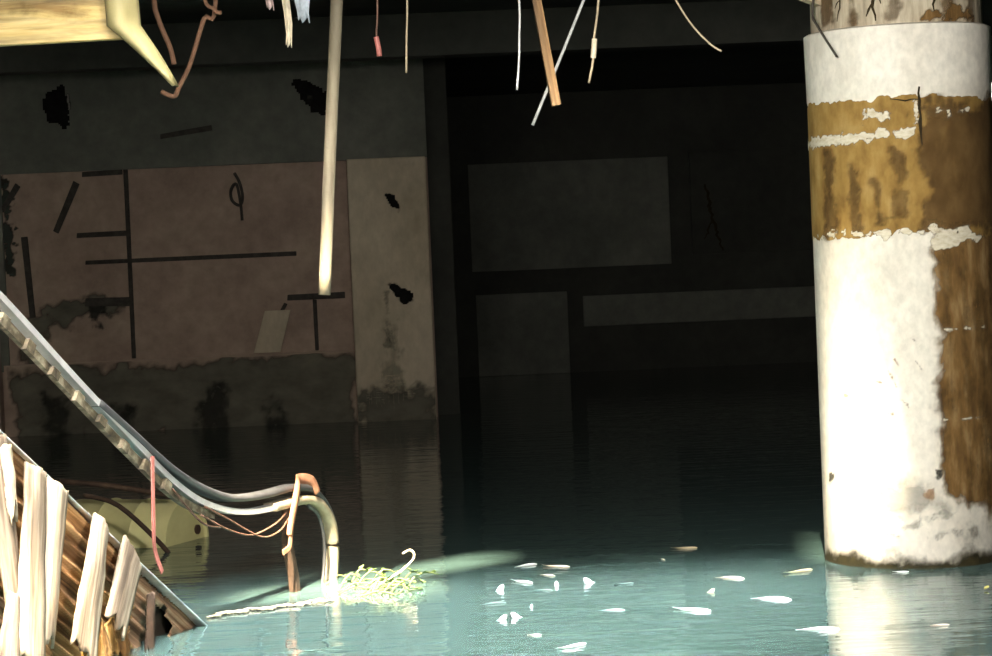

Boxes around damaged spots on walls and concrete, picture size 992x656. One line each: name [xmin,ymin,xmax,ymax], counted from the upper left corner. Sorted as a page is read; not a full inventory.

crack [866,0,881,21]
peeling [807,93,992,251]